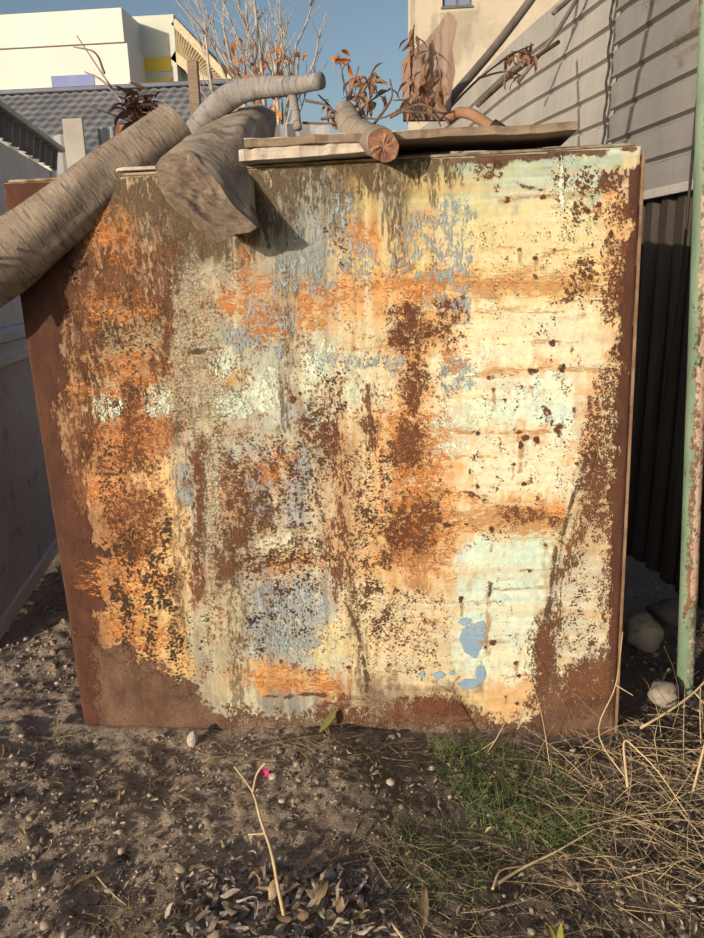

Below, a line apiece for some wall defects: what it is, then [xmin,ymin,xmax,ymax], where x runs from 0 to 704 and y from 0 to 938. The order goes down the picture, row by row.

corrosion [3,182,50,212]
corrosion [20,147,642,738]
peeling [207,154,639,689]
corrosion [682,284,704,629]